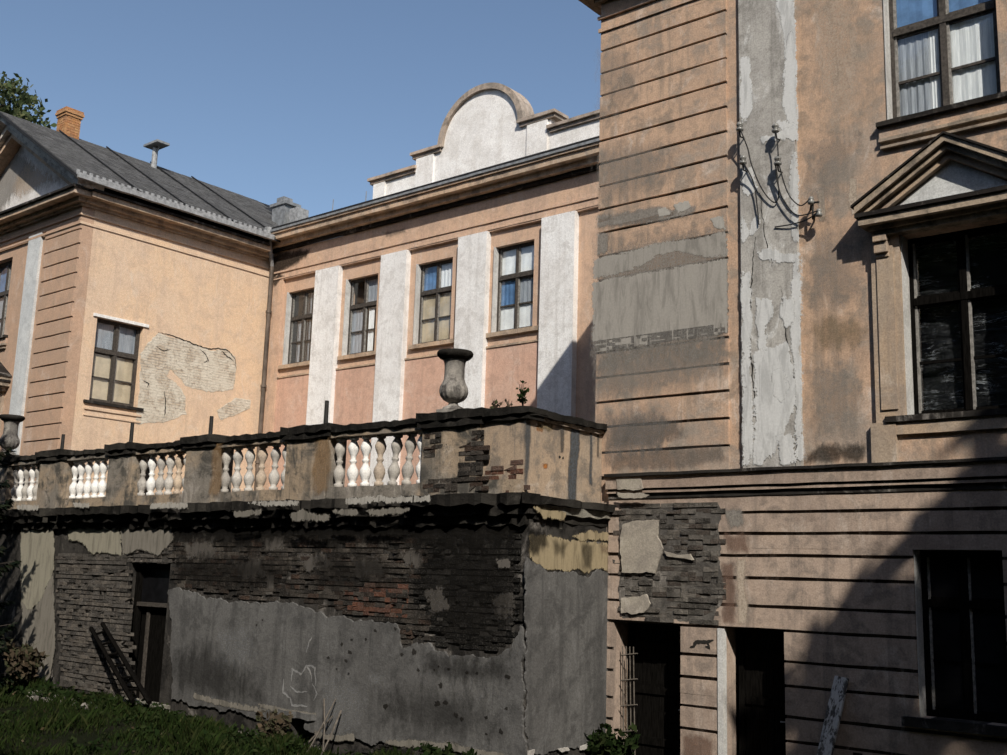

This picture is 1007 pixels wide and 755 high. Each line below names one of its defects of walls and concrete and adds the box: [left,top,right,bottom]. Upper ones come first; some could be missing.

peeling [596,201,695,255]
peeling [739,0,804,466]
peeling [136,333,251,425]
flaking render [234,428,530,522]
peeling [496,558,510,568]
flaking render [529,477,726,625]
flaking render [20,527,449,697]
spalling [193,692,316,715]
spalling [314,730,355,742]
spalling [385,739,504,755]